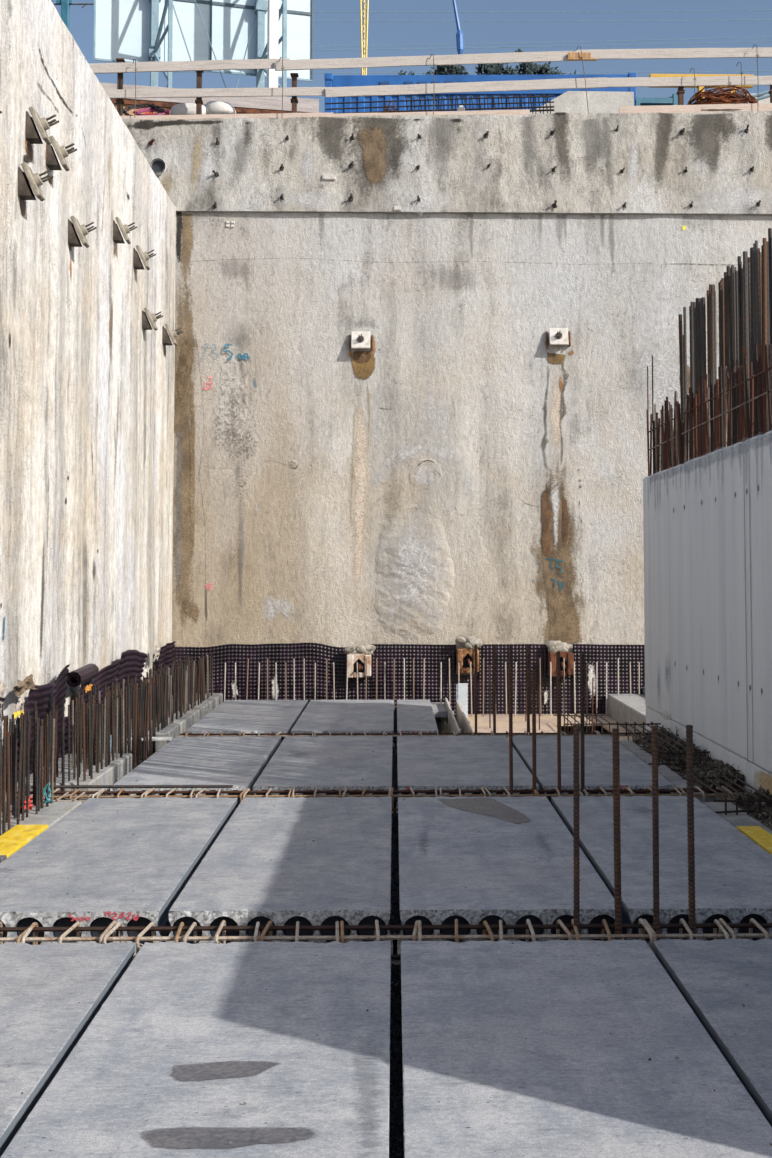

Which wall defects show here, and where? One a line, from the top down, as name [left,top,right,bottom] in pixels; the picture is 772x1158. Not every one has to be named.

damp [127,119,223,129]
damp [303,116,420,192]
damp [553,112,570,178]
damp [584,119,613,189]
damp [655,112,673,182]
damp [689,109,744,170]
damp [172,212,199,622]
rust [541,335,574,468]
rust [348,337,380,584]
damp [440,798,529,823]
damp [171,1061,279,1081]
damp [143,1127,314,1148]